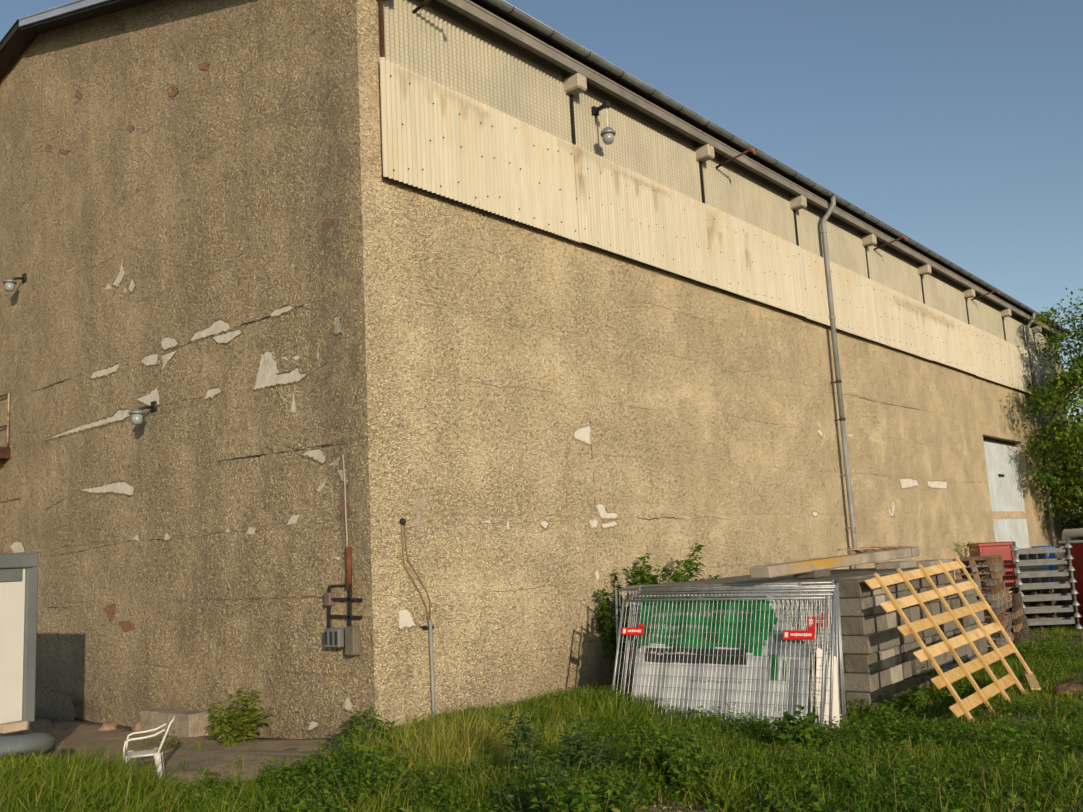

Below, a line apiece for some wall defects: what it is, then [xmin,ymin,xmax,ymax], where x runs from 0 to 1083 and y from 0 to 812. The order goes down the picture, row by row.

flaking render [105,257,136,294]
crack [234,316,269,328]
flaking render [140,318,243,372]
flaking render [89,362,120,380]
flaking render [253,349,309,413]
flaking render [44,385,161,442]
flaking render [572,424,592,446]
crack [214,441,353,465]
flaking render [77,480,136,497]
flaking render [887,477,947,517]
flaking render [589,502,619,530]
flaking render [396,606,417,631]